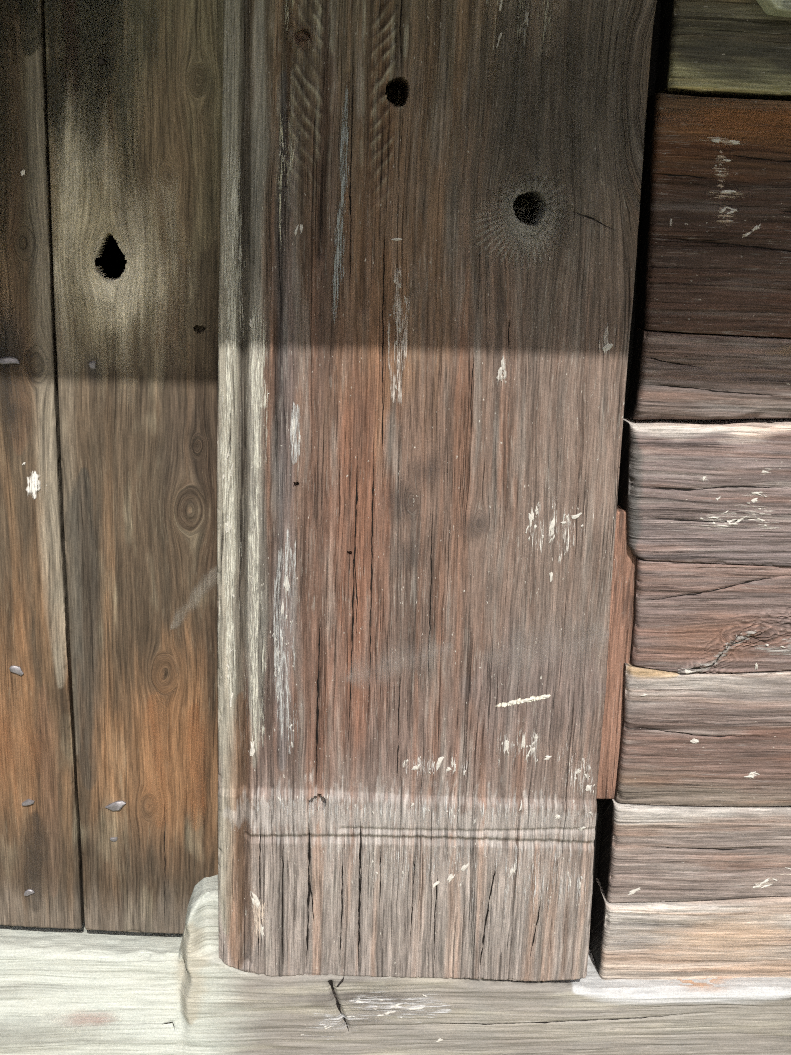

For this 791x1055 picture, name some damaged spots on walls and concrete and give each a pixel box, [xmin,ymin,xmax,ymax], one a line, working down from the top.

leakage [0,0,134,182]
crack [314,611,322,786]
crack [679,622,769,671]
crack [258,826,314,965]
crack [328,821,381,1031]
crack [410,845,438,970]